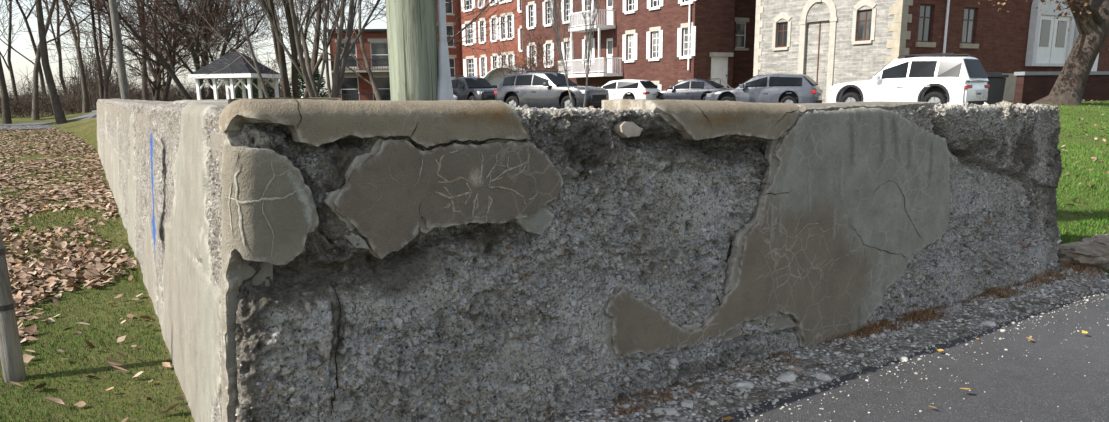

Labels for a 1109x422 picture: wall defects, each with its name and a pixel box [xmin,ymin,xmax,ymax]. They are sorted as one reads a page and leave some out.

crack [225,146,307,256]
crack [362,122,543,218]
spalling [221,104,1062,422]
crack [754,182,922,345]
crack [330,286,341,419]